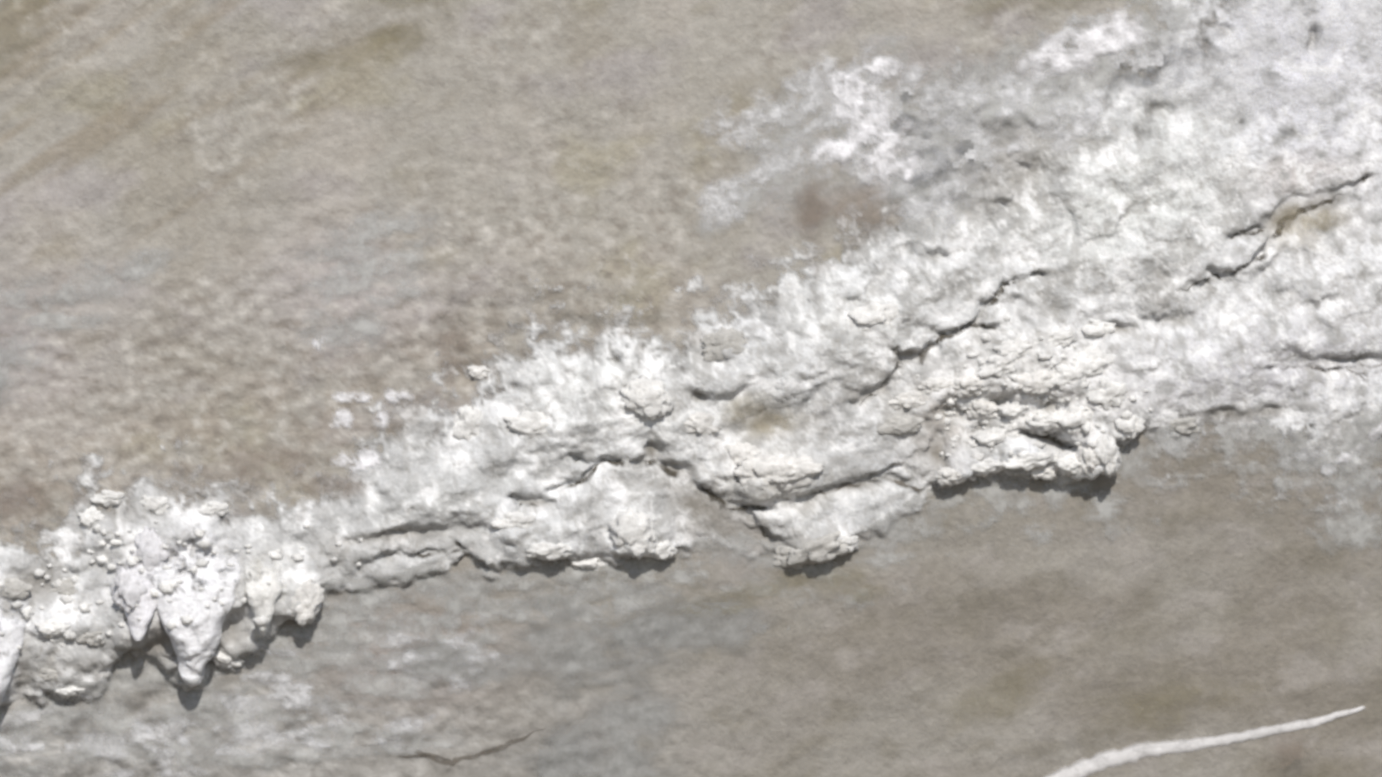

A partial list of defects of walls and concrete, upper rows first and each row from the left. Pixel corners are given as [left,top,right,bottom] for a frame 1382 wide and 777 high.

crack [1177,177,1368,291]
leakage [675,275,708,291]
leakage [335,409,353,427]
leakage [334,393,370,401]
leakage [369,402,387,427]
leakage [385,390,410,402]
leakage [1317,487,1381,547]
leakage [280,613,532,698]
leakage [528,587,752,684]
leakage [76,692,224,762]
leakage [223,668,317,742]
leakage [537,691,670,777]